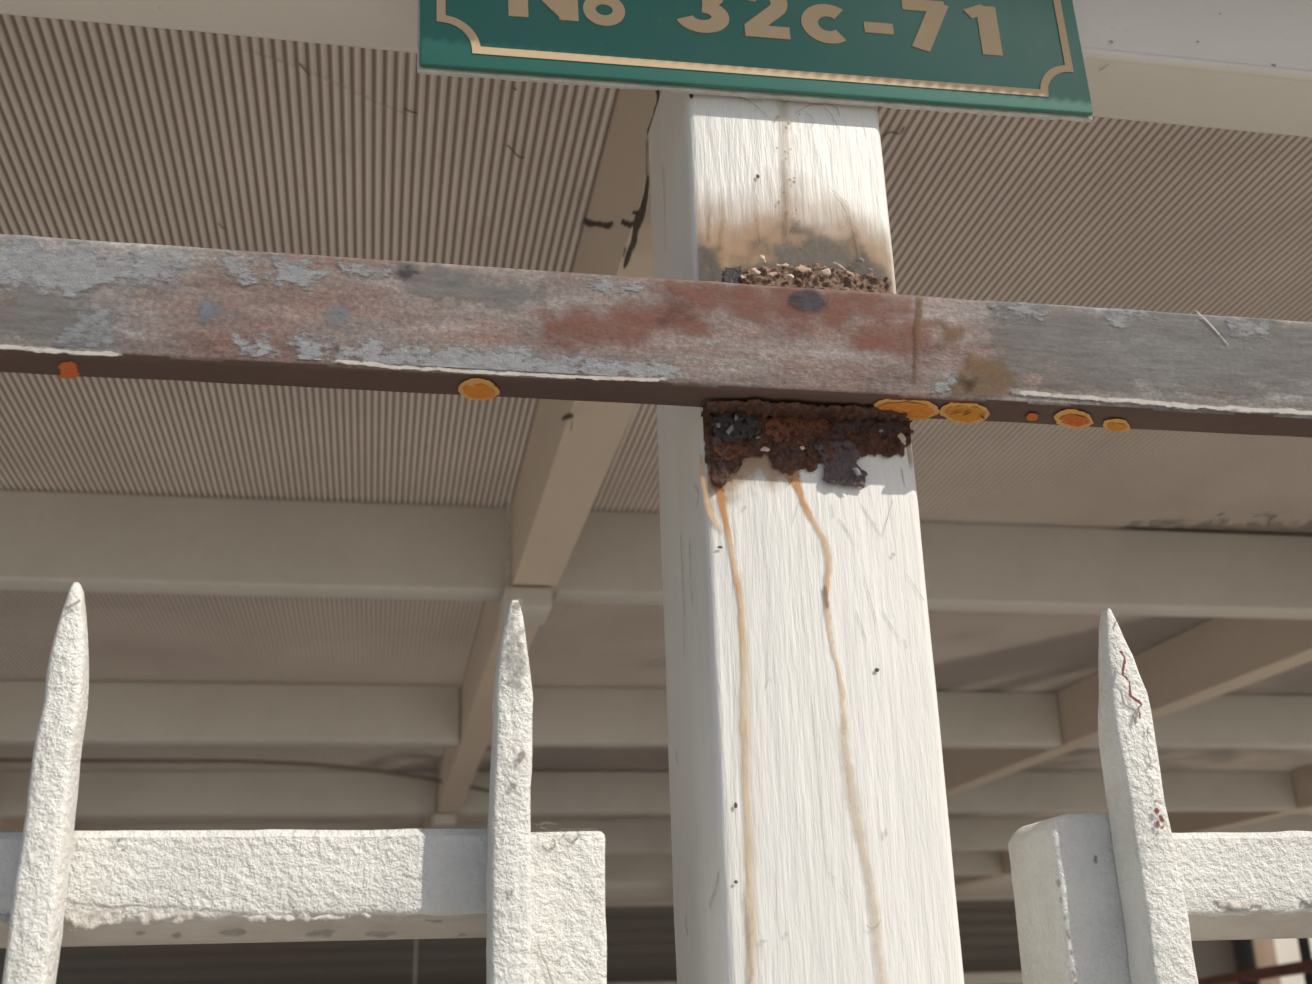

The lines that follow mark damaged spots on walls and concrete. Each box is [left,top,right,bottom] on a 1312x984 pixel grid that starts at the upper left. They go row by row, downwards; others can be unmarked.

crack [583,90,658,269]
peeling [0,235,186,356]
peeling [219,250,545,310]
corrosion [56,361,80,379]
peeling [231,330,683,382]
corrosion [458,378,500,401]
peeling [928,372,958,393]
peeling [988,300,1312,415]
corrosion [700,355,1012,984]
spalling [64,901,441,938]